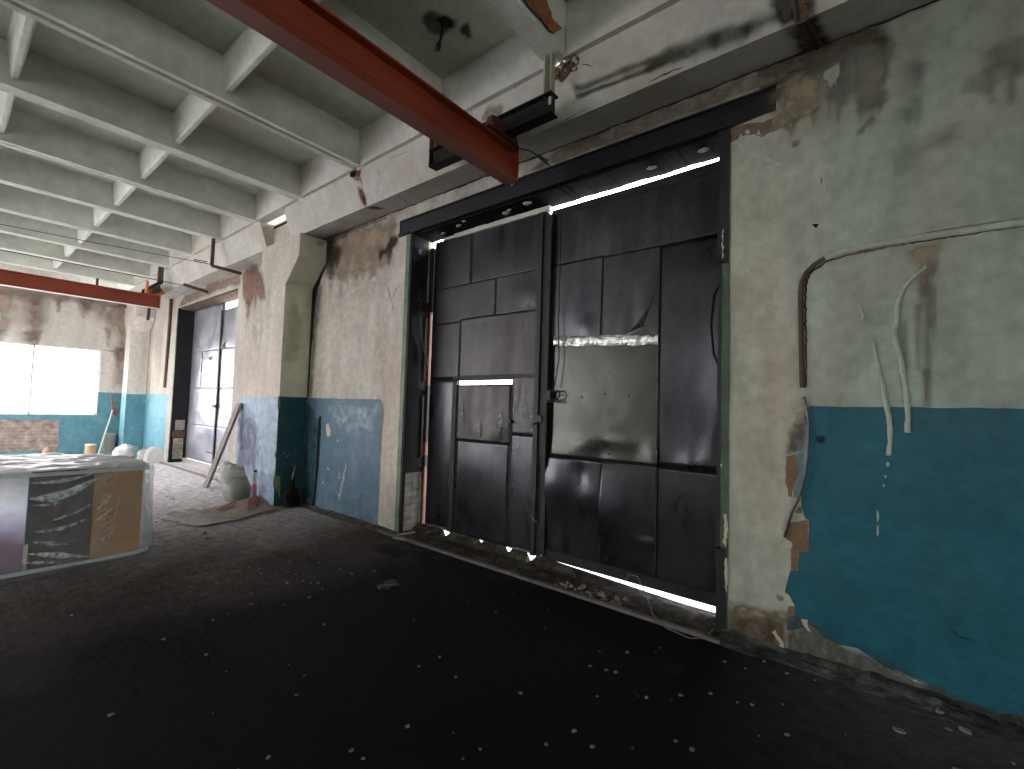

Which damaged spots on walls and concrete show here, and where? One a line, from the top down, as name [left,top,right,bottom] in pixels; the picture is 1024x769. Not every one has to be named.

water stain [423,12,471,38]
spalling [525,0,562,33]
water stain [535,27,890,169]
flaking render [731,63,840,142]
corrosion [356,167,382,210]
water stain [326,221,397,297]
peeling [785,452,811,571]